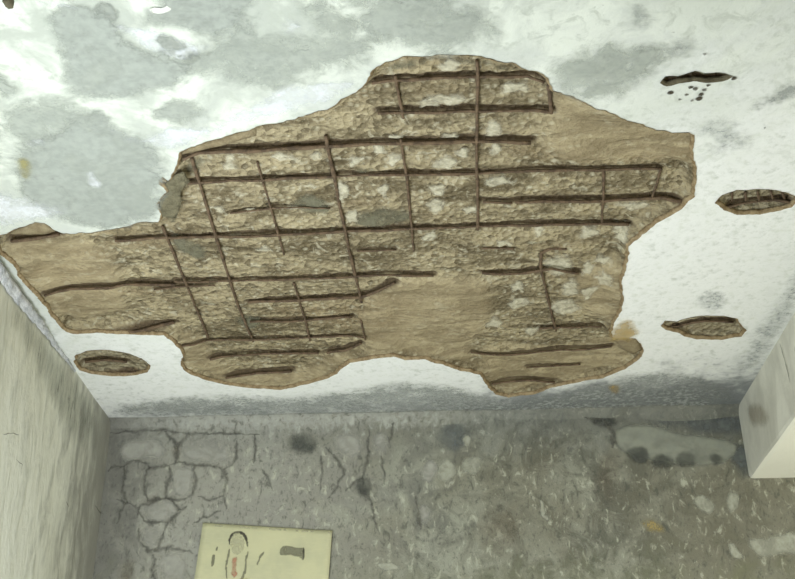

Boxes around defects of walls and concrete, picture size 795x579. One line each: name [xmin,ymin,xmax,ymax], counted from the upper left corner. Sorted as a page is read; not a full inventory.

water stain [50,0,493,120]
spalling [660,71,736,101]
water stain [0,101,209,229]
spalling [0,54,697,398]
spalling [715,189,795,215]
spalling [661,315,747,340]
crack [97,429,270,579]
crack [320,435,385,524]